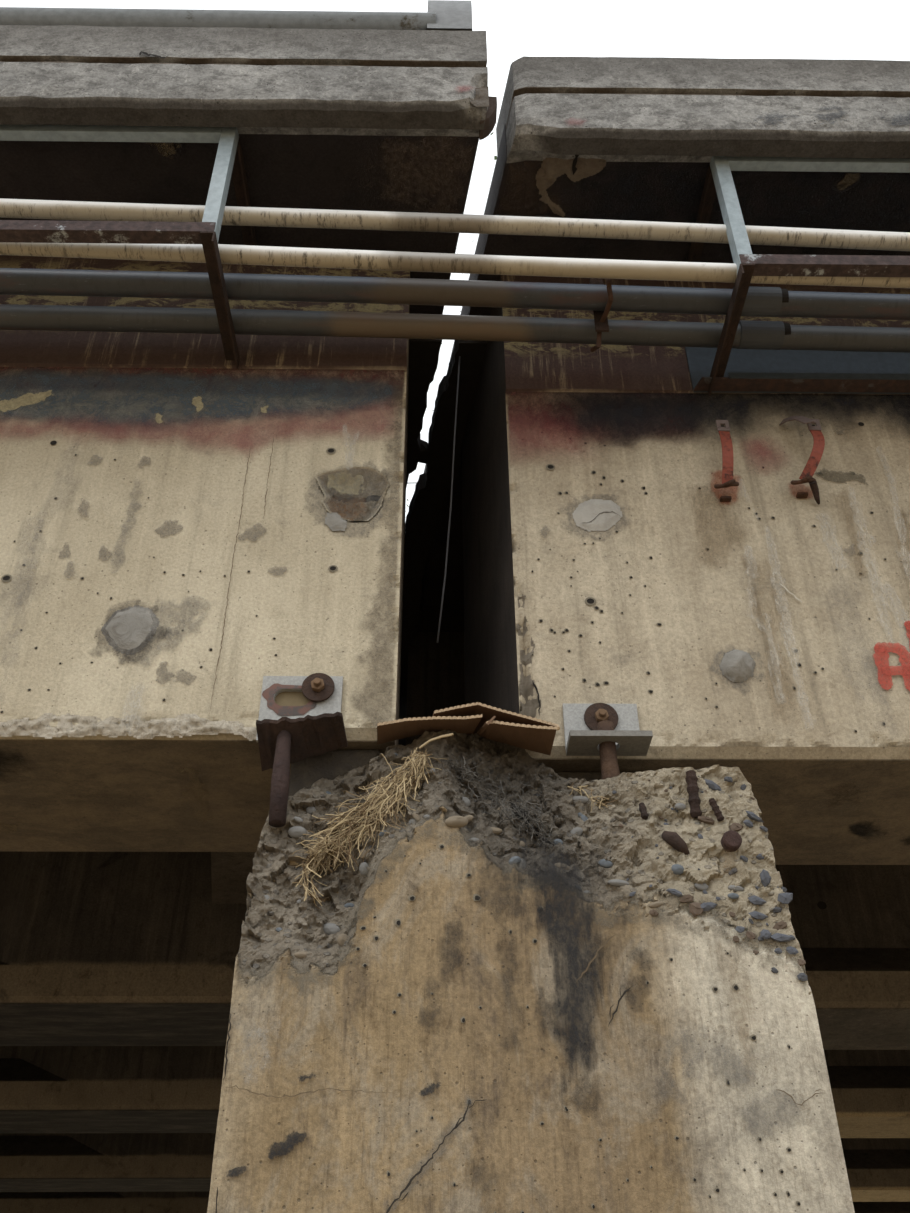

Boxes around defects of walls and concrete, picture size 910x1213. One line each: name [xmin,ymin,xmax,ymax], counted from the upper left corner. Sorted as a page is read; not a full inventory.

spalling [535,155,607,217]
spalling [315,467,389,531]
rust [639,802,648,820]
rust [685,770,724,821]
spalling [238,730,808,989]
rust [661,831,690,855]
crack [386,1100,484,1213]